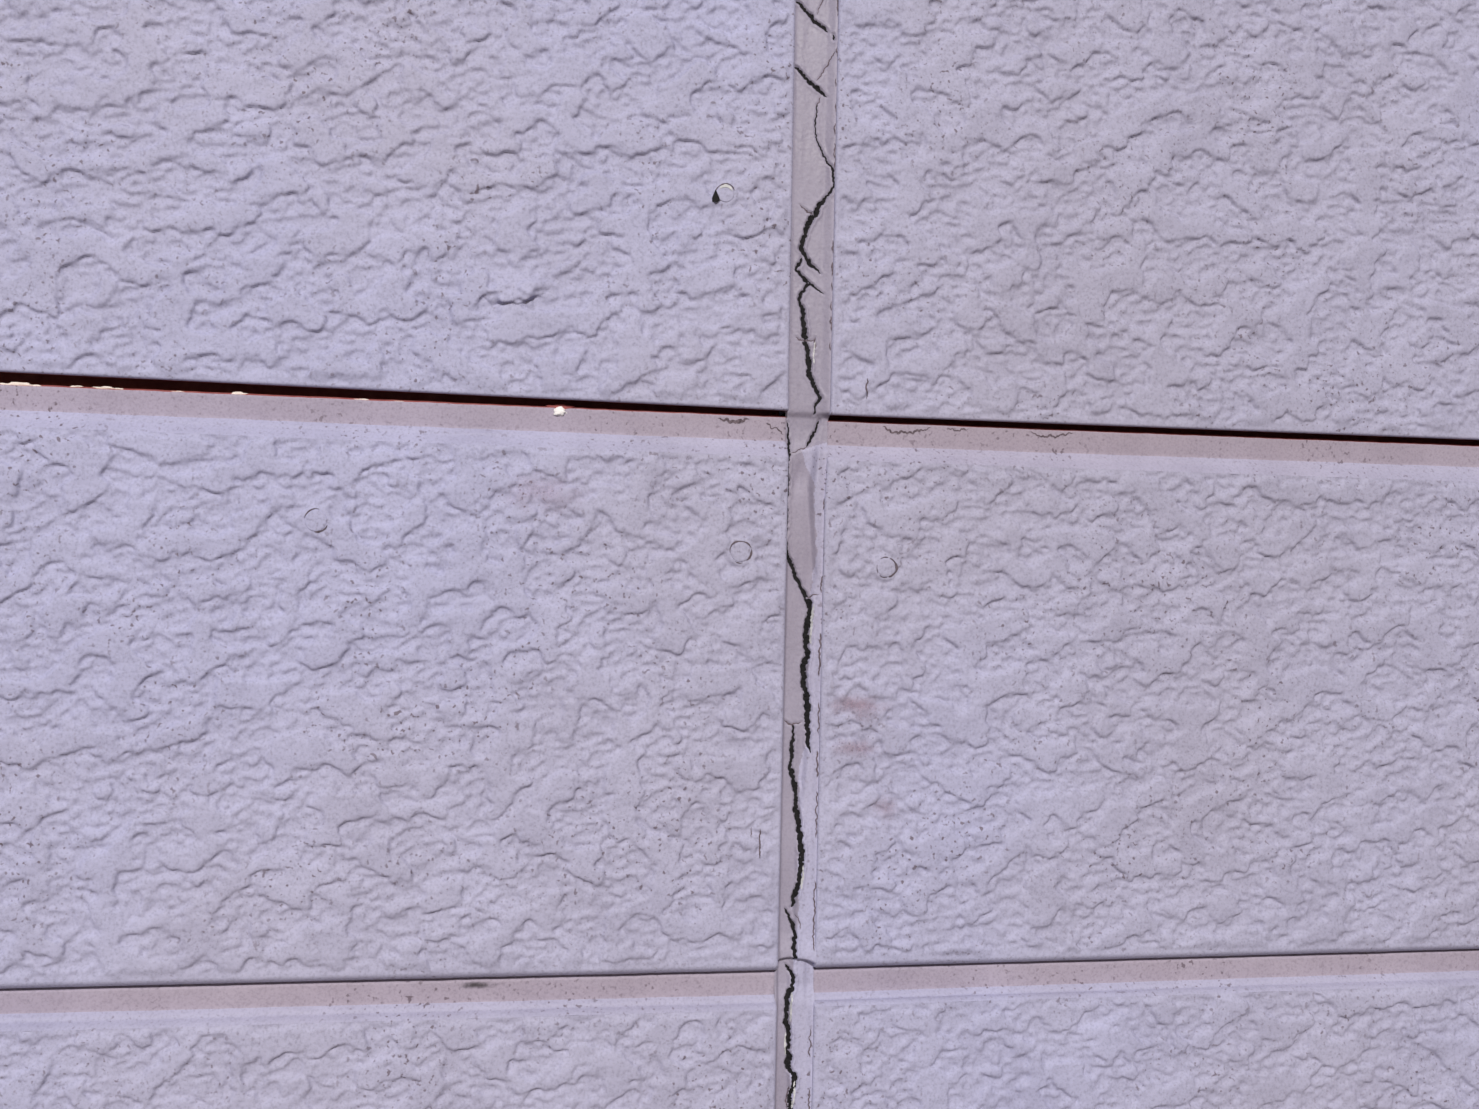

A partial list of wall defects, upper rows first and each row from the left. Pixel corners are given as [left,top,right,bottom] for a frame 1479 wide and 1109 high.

crack [719,0,838,1109]
crack [865,378,969,434]